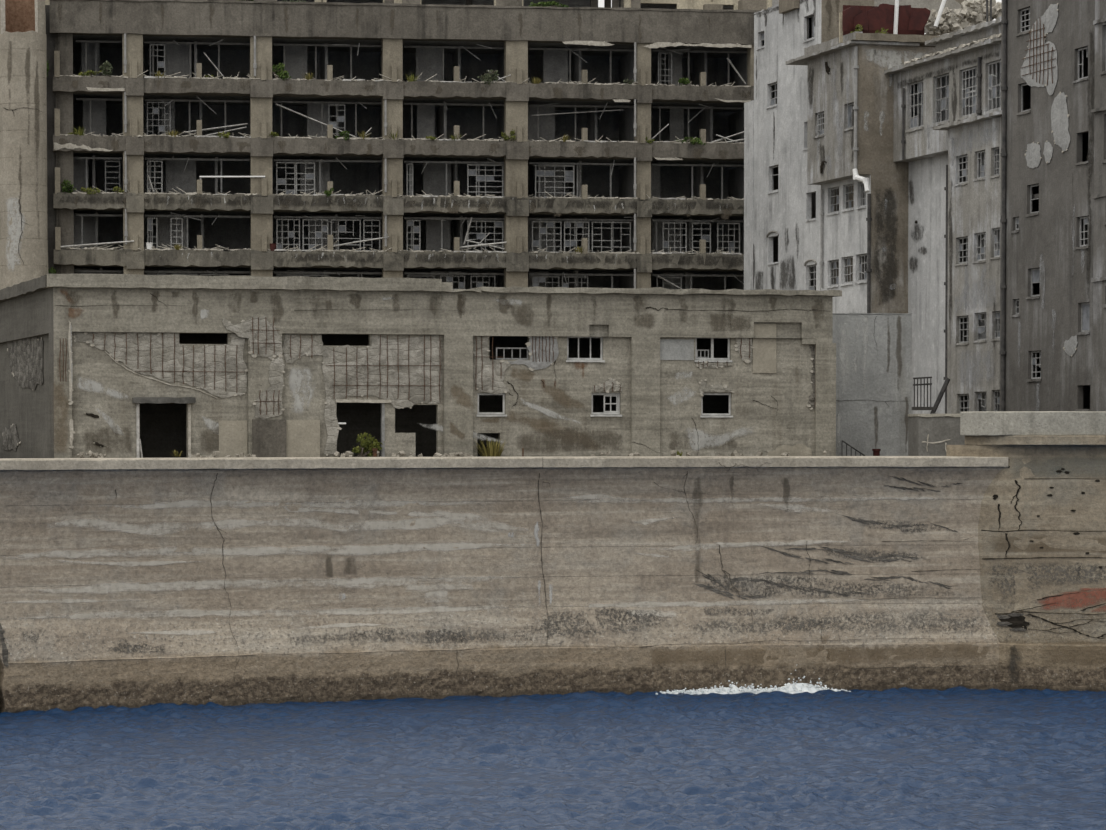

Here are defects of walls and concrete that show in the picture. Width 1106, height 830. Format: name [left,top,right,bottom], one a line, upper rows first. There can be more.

flaking render [1021,3,1070,168]
leakage [875,190,897,302]
leakage [909,226,926,271]
spalling [59,316,442,456]
spalling [473,336,559,394]
leakage [520,403,617,451]
leakage [689,430,746,450]
crack [50,473,261,682]
crack [428,473,550,671]
crack [654,420,858,673]
crack [882,478,1101,598]
crack [971,592,1106,639]